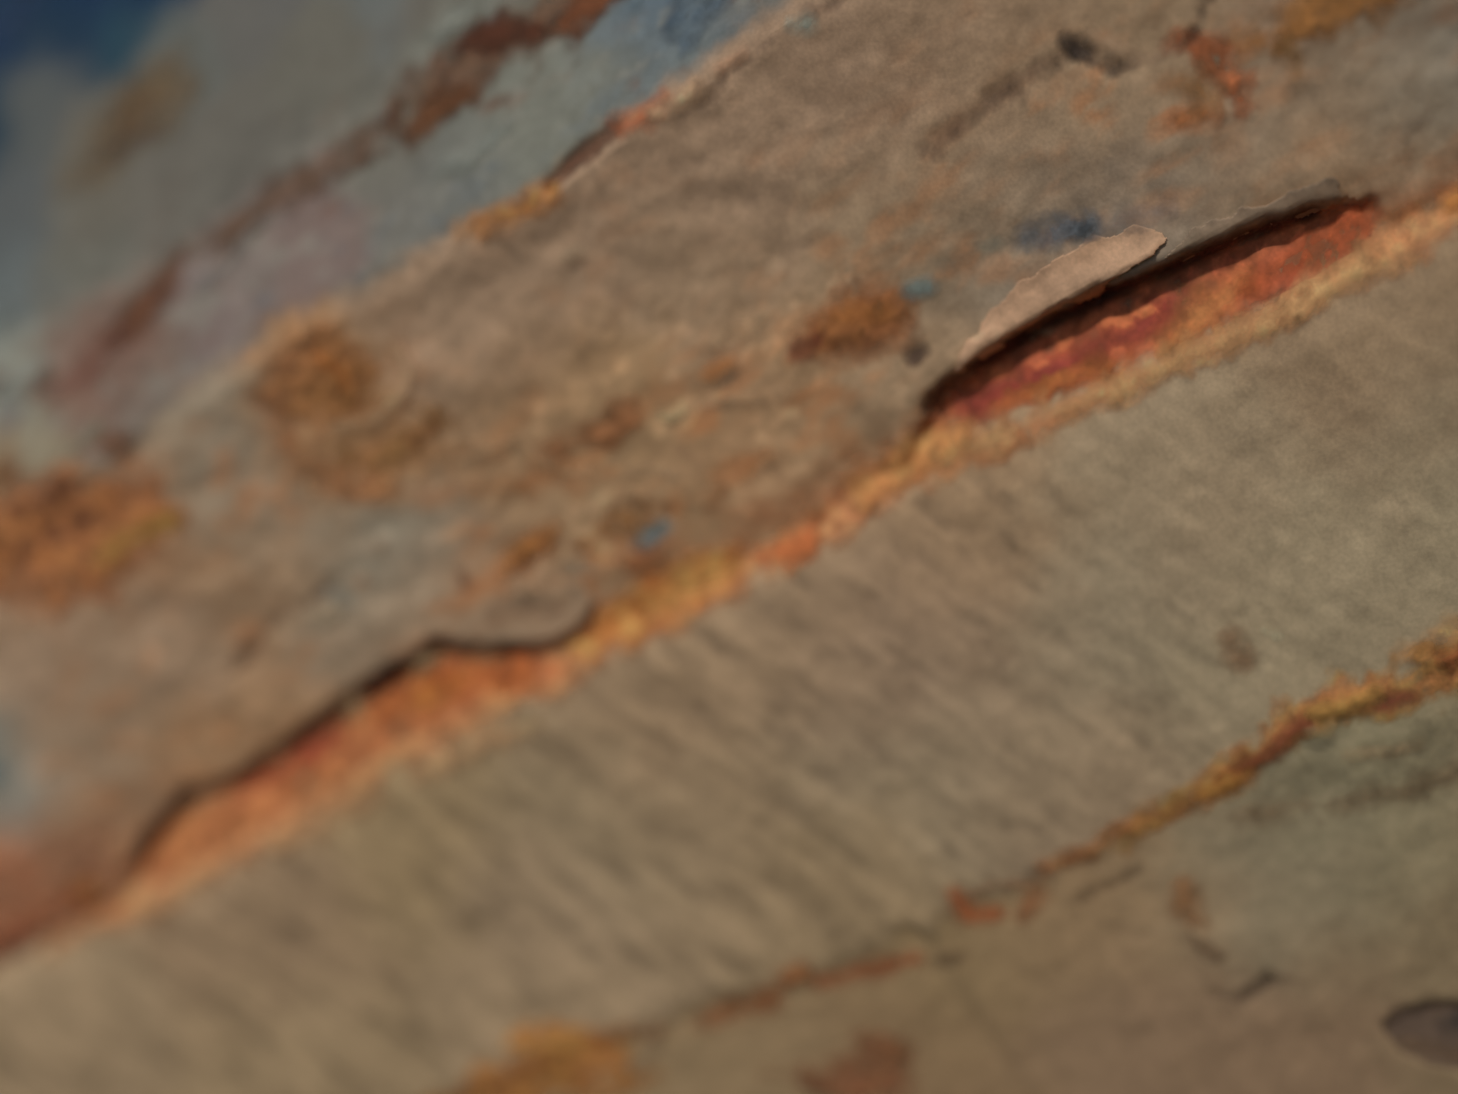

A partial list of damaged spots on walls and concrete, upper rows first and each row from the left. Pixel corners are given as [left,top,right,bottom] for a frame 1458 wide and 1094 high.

corrosion [1249,0,1394,50]
corrosion [1174,30,1244,124]
peeling [924,177,1374,425]
corrosion [48,189,1458,952]
peeling [1384,1001,1458,1068]